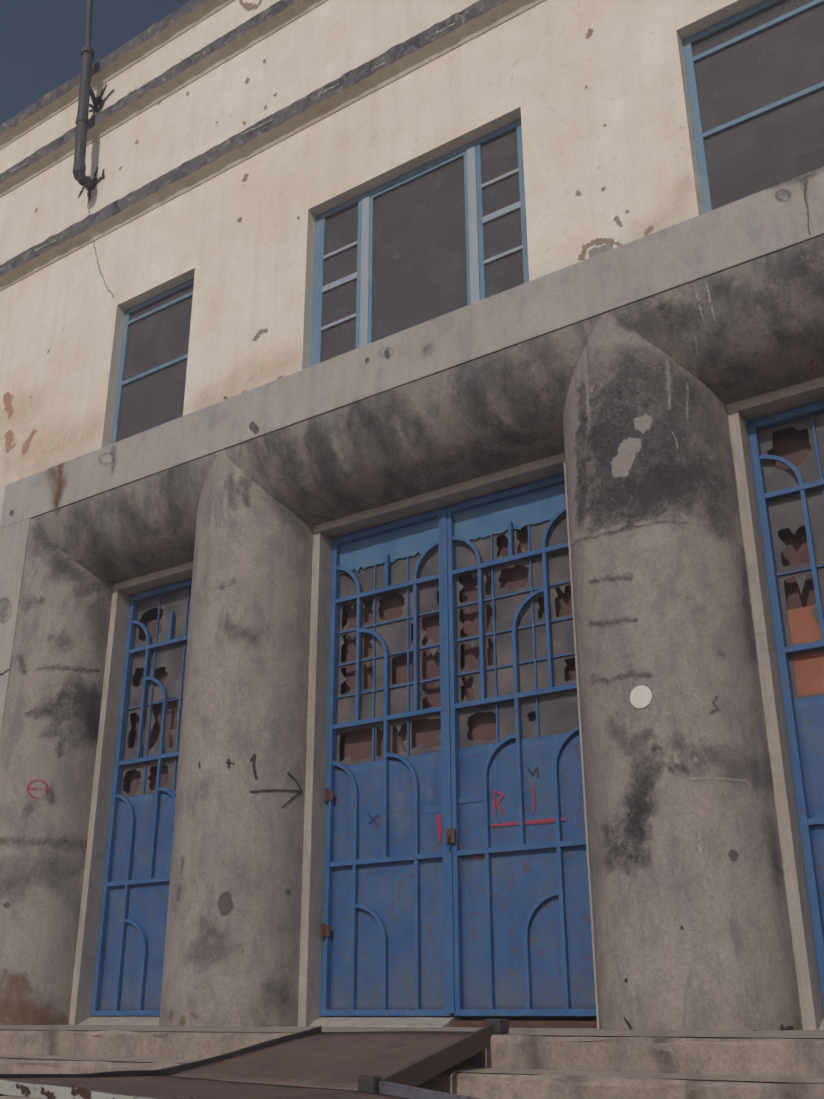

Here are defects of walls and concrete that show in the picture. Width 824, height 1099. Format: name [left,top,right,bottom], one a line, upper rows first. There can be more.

flaking render [577,238,622,260]
peeling [3,392,37,455]
corrosion [51,463,63,511]
crack [571,520,676,546]
damp [604,746,702,871]